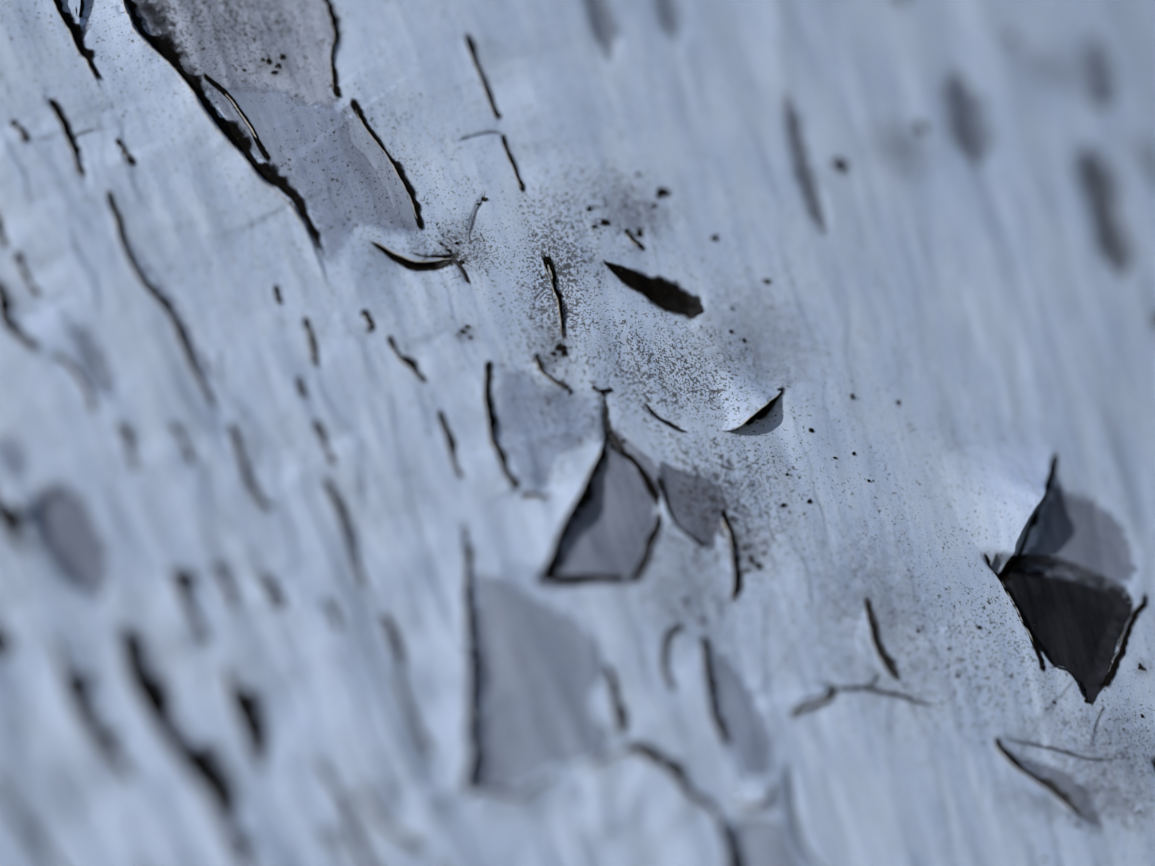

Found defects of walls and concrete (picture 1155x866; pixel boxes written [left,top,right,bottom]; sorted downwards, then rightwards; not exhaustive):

peeling [3,98,85,182]
peeling [21,0,423,280]
crack [371,191,486,284]
crack [603,260,704,318]
crack [594,385,631,460]
crack [645,403,689,433]
peeling [360,353,799,866]
spalling [940,445,1148,704]
crack [816,673,938,706]
crack [1002,706,1116,761]